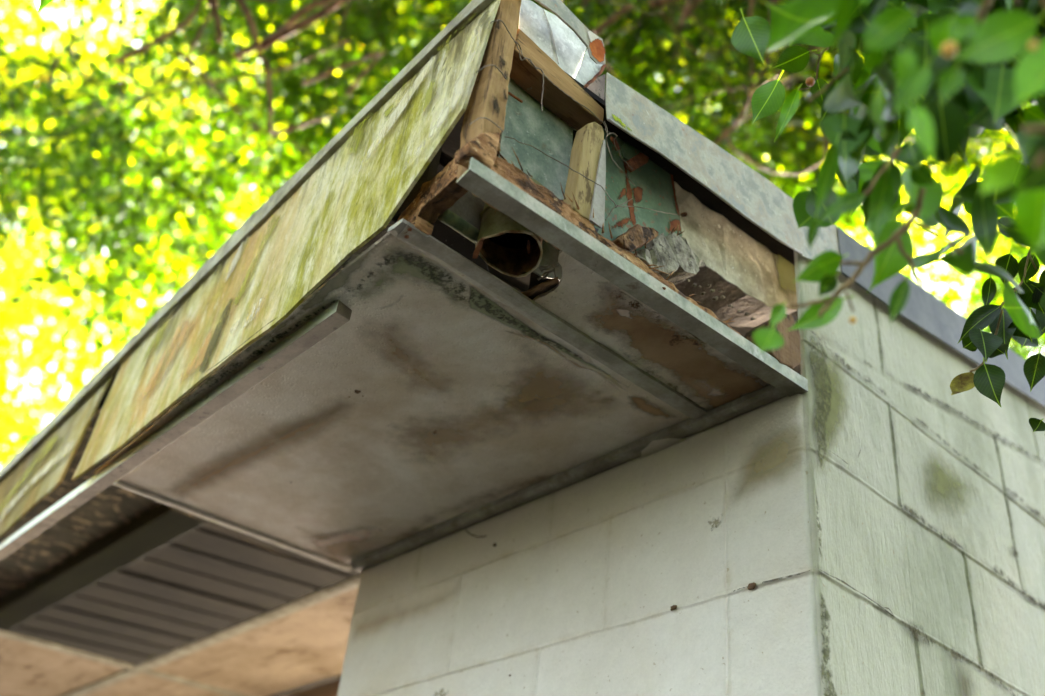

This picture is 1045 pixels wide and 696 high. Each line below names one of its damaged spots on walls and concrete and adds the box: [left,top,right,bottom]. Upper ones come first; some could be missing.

leakage [360,11,501,169]
leakage [493,56,508,114]
corrosion [612,160,643,228]
leakage [214,235,249,281]
leakage [182,298,335,405]
leakage [357,252,621,389]
leakage [514,367,573,416]
leakage [592,292,768,408]
leakage [178,412,334,493]